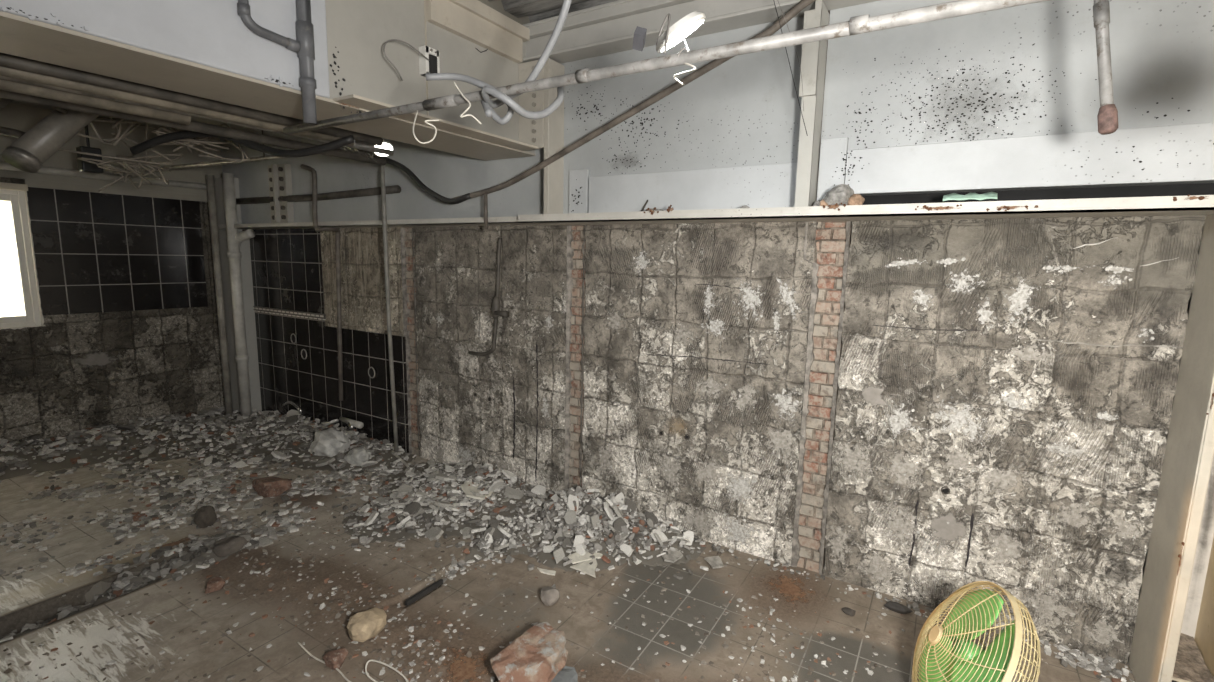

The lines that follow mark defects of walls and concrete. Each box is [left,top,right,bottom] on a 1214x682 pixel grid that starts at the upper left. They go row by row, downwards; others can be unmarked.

leakage [834,37,1072,186]
spalling [400,228,444,463]
spalling [544,225,617,488]
spalling [696,221,924,588]
peeling [886,257,1038,329]
peeling [934,393,1033,498]
peeling [1042,265,1134,286]
peeling [1097,411,1118,421]
crack [908,500,919,566]
crack [965,513,974,567]
peeling [981,524,1129,645]
peeling [1056,499,1141,540]